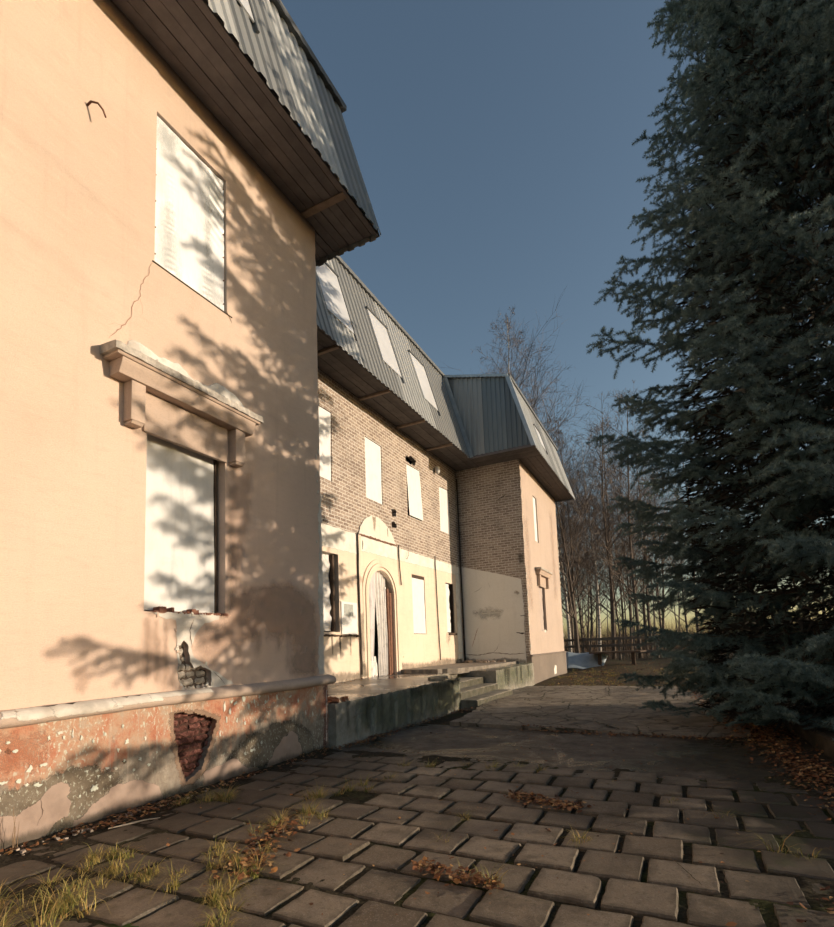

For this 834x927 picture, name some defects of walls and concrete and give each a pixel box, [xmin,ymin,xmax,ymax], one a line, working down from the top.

crack [111,265,151,336]
flaking render [0,611,234,722]
water stain [204,584,316,673]
peeling [0,729,129,836]
spalling [169,695,314,787]